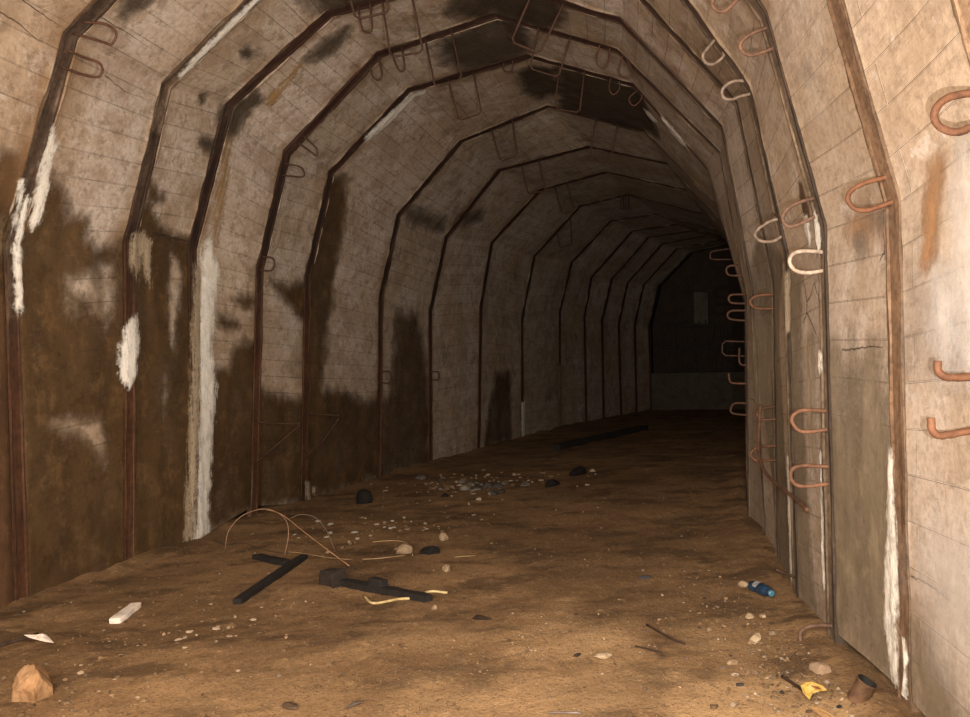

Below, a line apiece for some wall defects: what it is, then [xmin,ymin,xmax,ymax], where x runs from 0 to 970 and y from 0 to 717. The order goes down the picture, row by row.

damp [179,0,258,79]
damp [436,0,563,71]
damp [518,66,686,147]
damp [803,213,821,251]
corrosion [921,156,943,271]
damp [0,26,429,609]
damp [750,242,955,717]